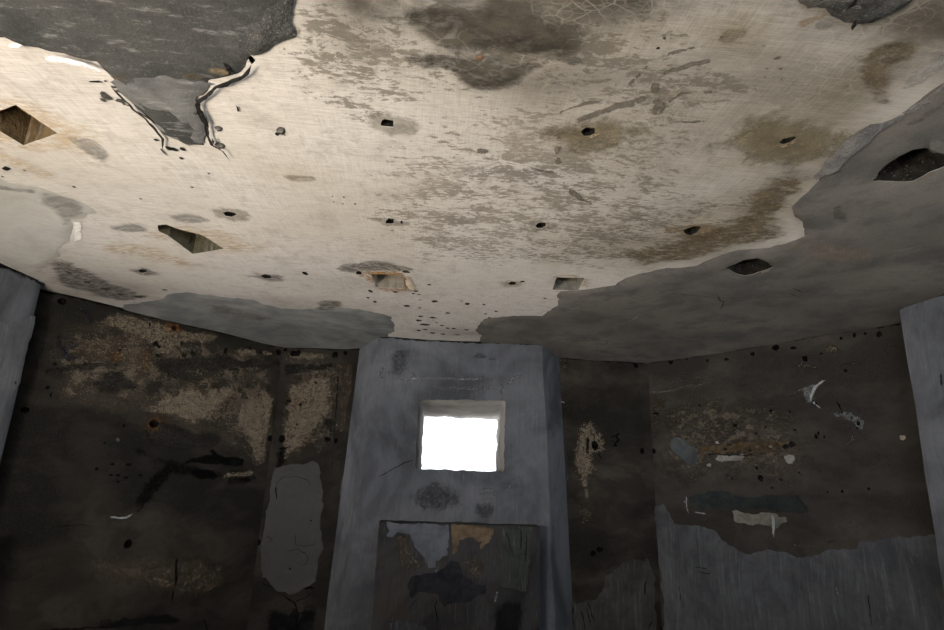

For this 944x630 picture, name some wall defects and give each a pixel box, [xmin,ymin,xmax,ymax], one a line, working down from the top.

peeling [45,56,101,72]
flaking render [100,86,129,106]
crack [195,62,252,159]
damp [406,8,586,90]
spalling [532,83,688,173]
damp [862,43,914,102]
hole [683,225,701,235]
damp [628,177,800,265]
peeling [45,313,350,478]
peeling [573,422,609,498]
peeling [652,394,825,489]
peeling [387,522,494,607]